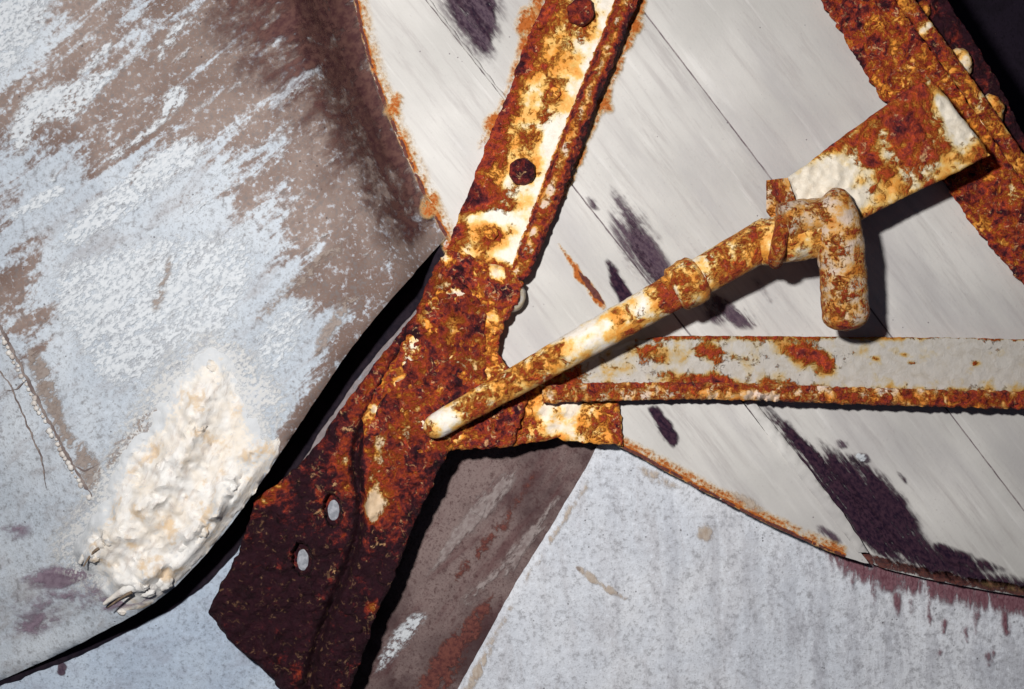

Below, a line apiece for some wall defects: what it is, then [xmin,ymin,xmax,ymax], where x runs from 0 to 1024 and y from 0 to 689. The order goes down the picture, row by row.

rust [354,0,452,251]
rust [480,0,545,142]
rust [560,0,646,202]
rust [561,248,605,308]
crack [0,325,98,501]
leakage [16,333,288,634]
rust [455,476,533,578]
rust [620,438,1024,637]
leakage [767,408,1024,591]
rust [417,595,496,689]